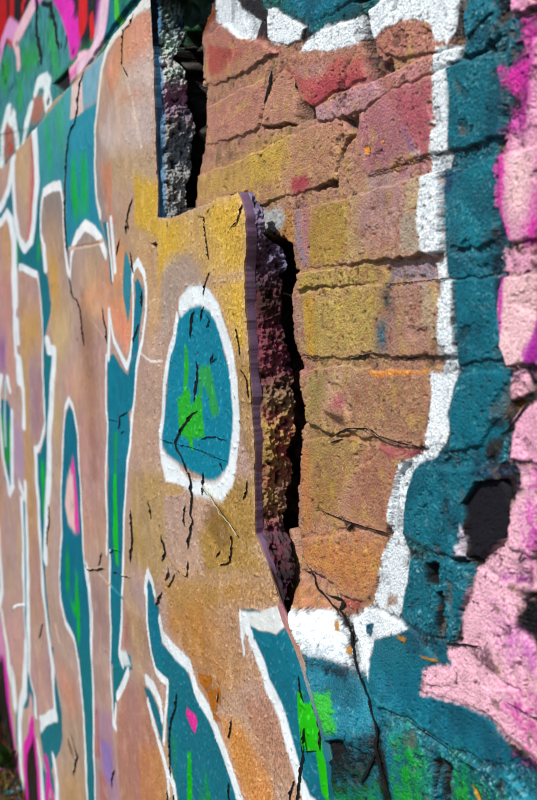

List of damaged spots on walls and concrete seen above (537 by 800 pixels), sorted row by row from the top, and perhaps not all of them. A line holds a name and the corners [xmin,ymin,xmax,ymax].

crack [63,70,84,252]
spalling [157,0,195,218]
crack [188,204,242,338]
crack [83,353,237,606]
crack [235,329,248,397]
crack [331,427,420,447]
crack [288,677,321,800]
crack [305,569,390,798]